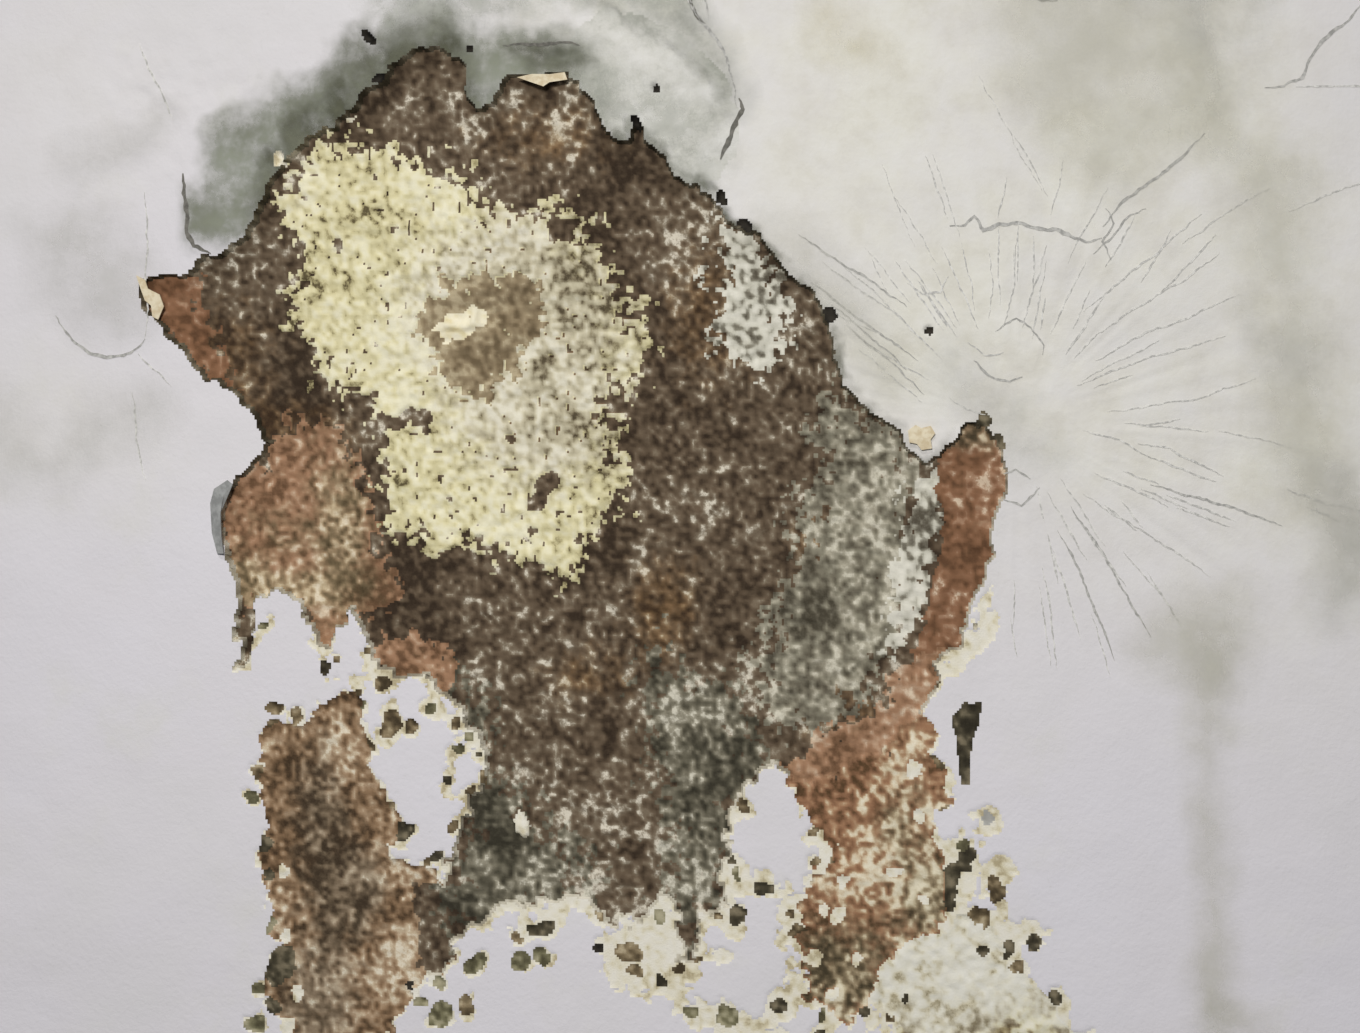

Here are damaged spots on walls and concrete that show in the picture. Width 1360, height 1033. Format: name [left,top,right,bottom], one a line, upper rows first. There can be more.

damp [187,0,585,239]
crack [687,0,745,160]
crack [1265,6,1360,88]
crack [798,75,1360,675]
flaking render [136,45,1096,1033]